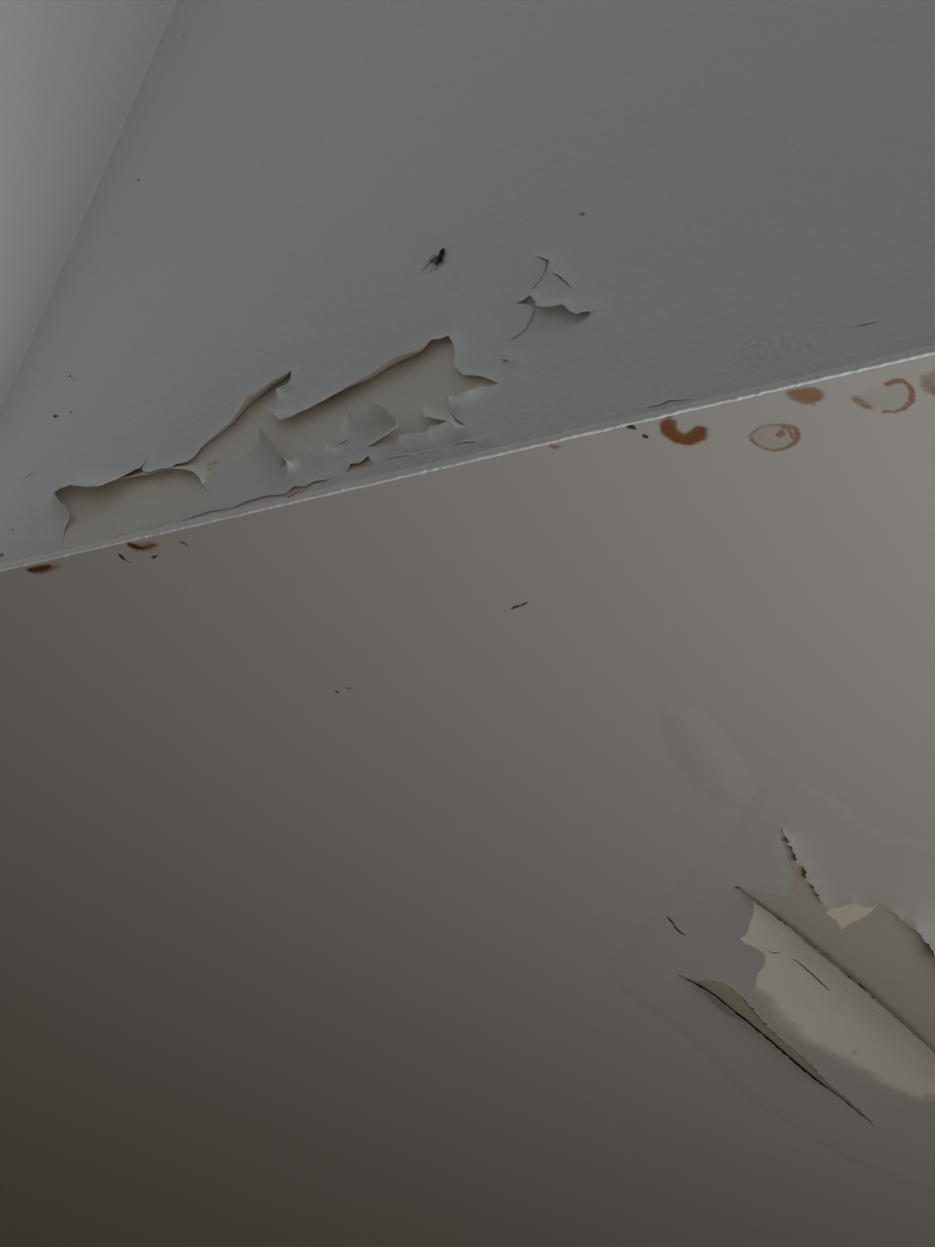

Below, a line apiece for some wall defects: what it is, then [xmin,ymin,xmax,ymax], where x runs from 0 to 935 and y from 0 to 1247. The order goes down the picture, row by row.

peeling [22,244,621,556]
corrosion [788,388,824,404]
corrosion [853,379,935,413]
corrosion [661,419,707,445]
corrosion [751,424,801,452]
peeling [604,779,935,1195]